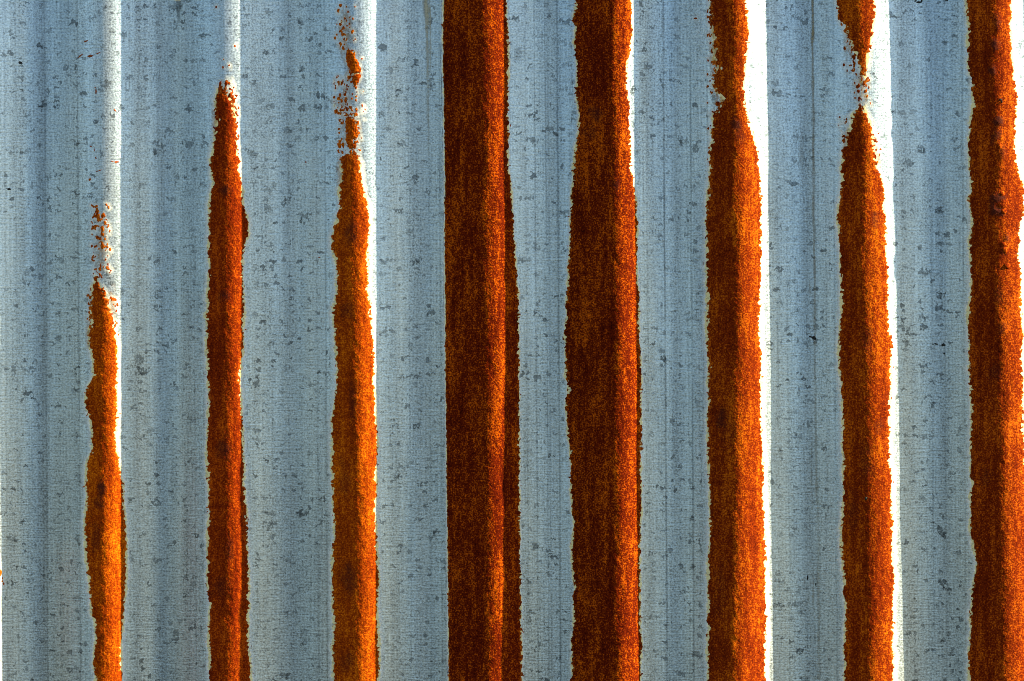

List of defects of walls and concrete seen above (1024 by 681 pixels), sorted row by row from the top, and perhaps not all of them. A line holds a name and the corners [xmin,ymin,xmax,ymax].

corrosion [81,203,130,681]
corrosion [202,59,254,681]
corrosion [328,4,383,681]
corrosion [441,0,524,681]
corrosion [562,0,646,681]
corrosion [694,0,770,681]
corrosion [834,0,898,681]
corrosion [964,0,1024,681]